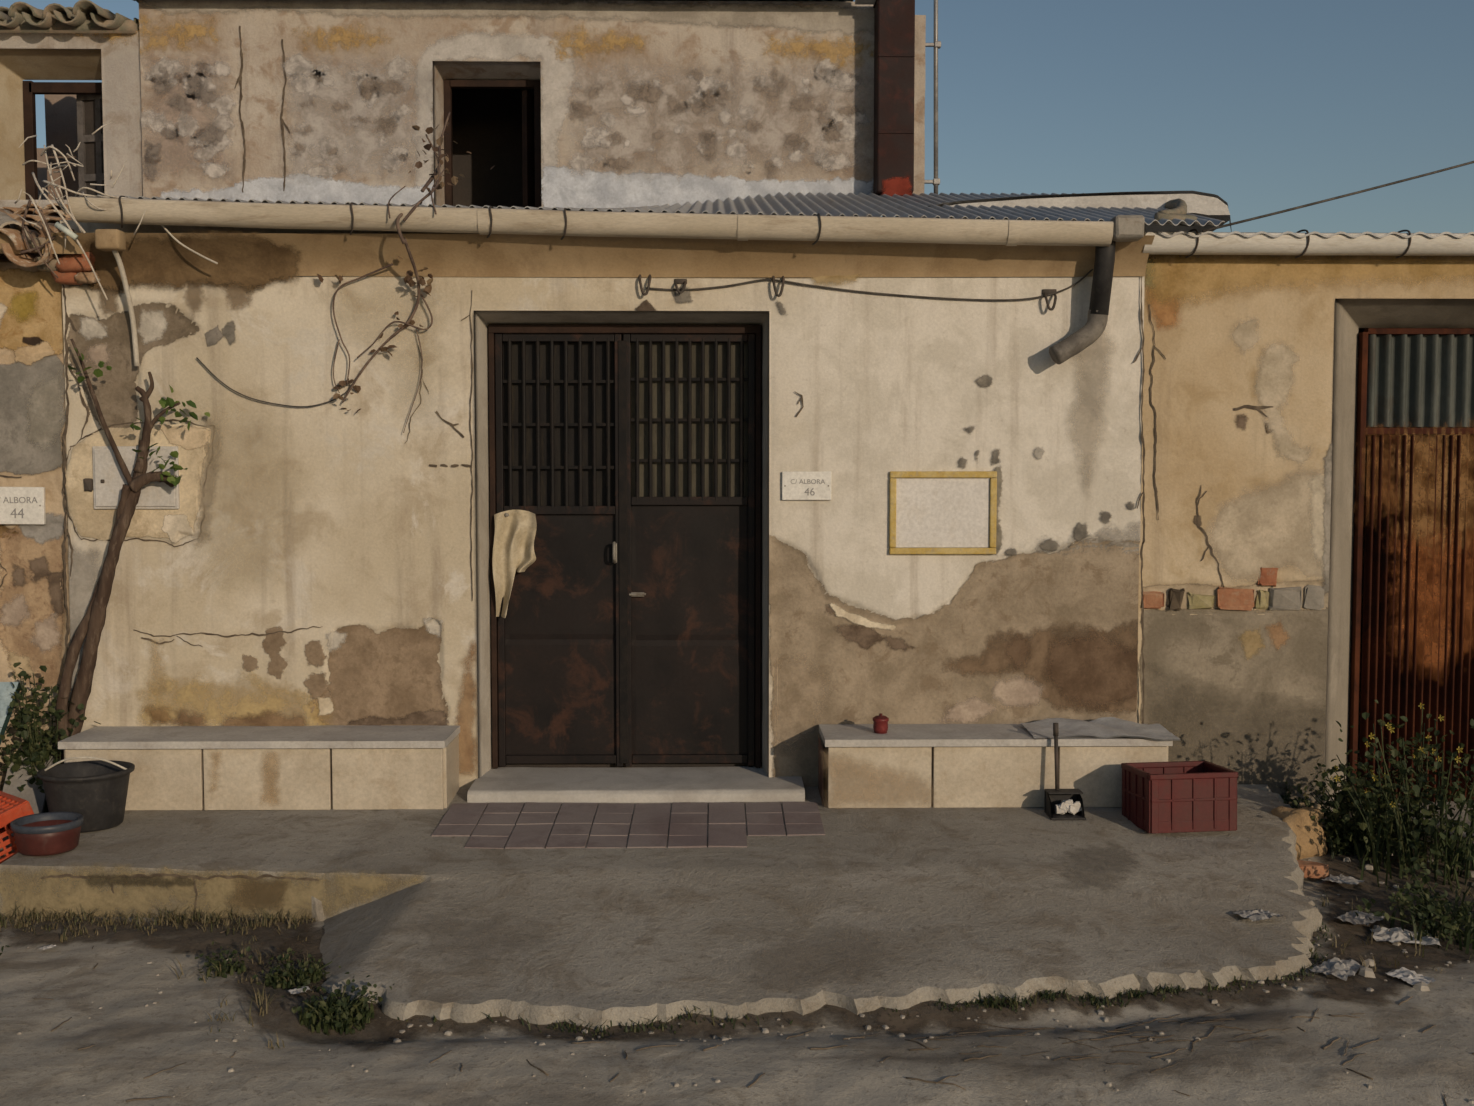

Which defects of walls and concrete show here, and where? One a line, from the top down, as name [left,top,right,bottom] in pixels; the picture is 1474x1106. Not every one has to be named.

flaking render [0,226,235,430]
flaking render [0,524,66,690]
crack [135,626,323,646]
flaking render [242,627,287,679]
flaking render [304,618,449,726]
flaking render [769,319,1332,804]
crack [1133,276,1166,724]
crack [1196,487,1224,587]
corrosion [1362,432,1474,670]